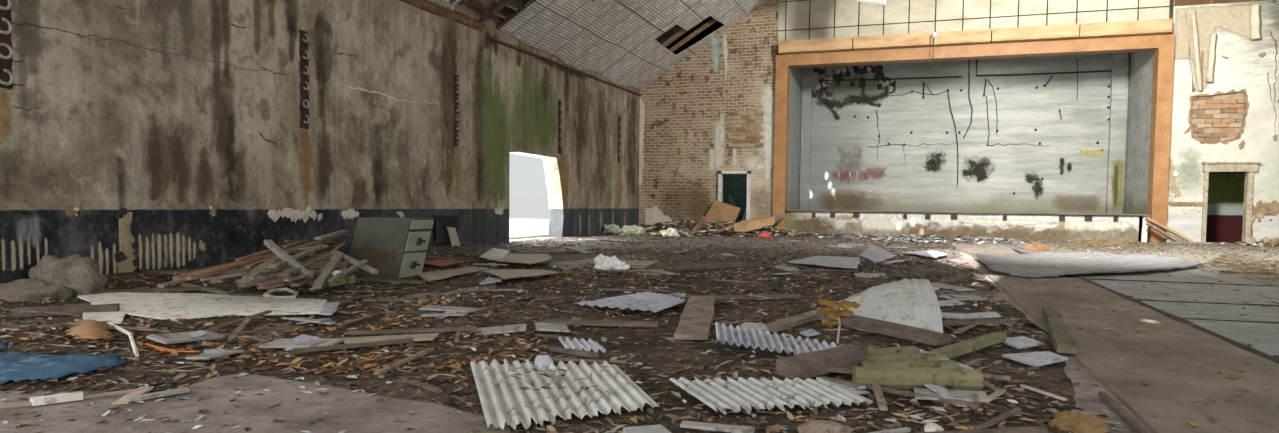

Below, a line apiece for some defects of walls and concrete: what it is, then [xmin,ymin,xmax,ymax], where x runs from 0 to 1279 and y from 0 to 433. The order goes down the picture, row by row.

crack [12,22,288,110]
leakage [147,0,244,202]
leakage [254,0,297,60]
leakage [315,16,332,199]
leakage [353,159,386,207]
crack [338,53,448,194]
leakage [441,22,457,191]
leakage [476,32,505,201]
flaking render [997,186,1279,270]
flaking render [1168,158,1203,207]
peeling [1175,4,1266,149]